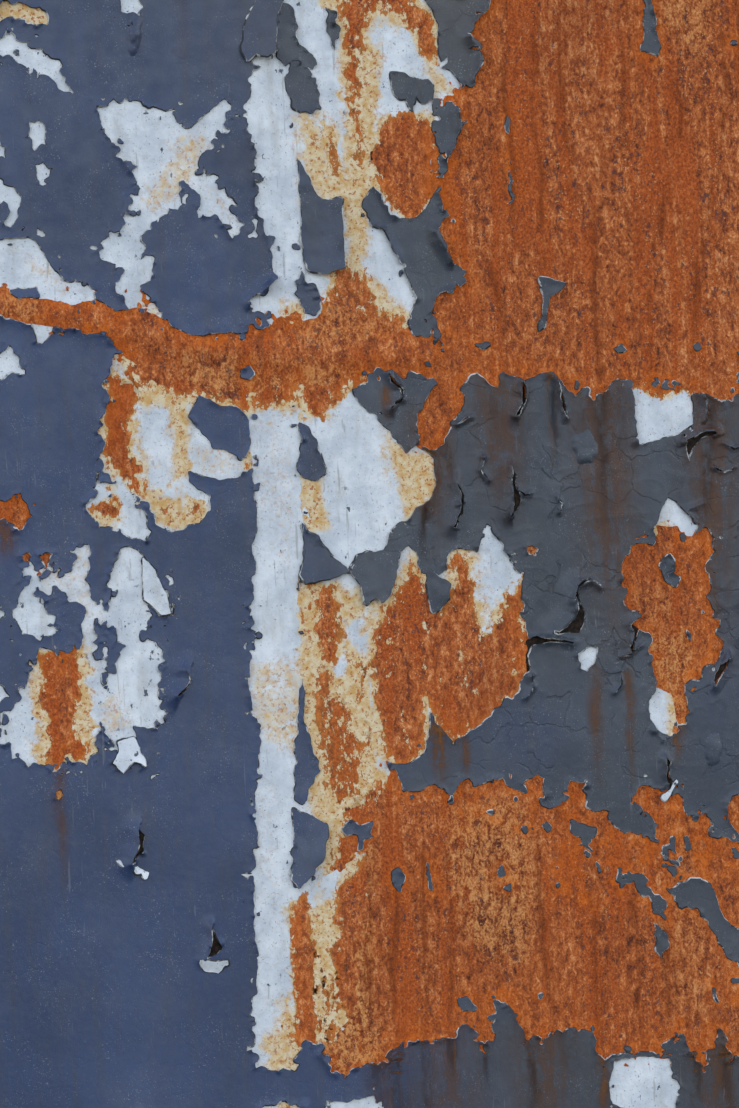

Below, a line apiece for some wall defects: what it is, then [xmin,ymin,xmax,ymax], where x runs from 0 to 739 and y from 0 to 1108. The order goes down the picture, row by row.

peeling [0,0,73,93]
peeling [29,120,46,150]
peeling [90,0,460,330]
peeling [0,179,95,305]
rust [0,0,739,476]
peeling [0,346,25,379]
peeling [632,380,716,455]
peeling [654,498,698,536]
rust [621,514,730,747]
peeling [0,353,588,1071]
peeling [649,687,683,736]
rust [322,752,739,1102]